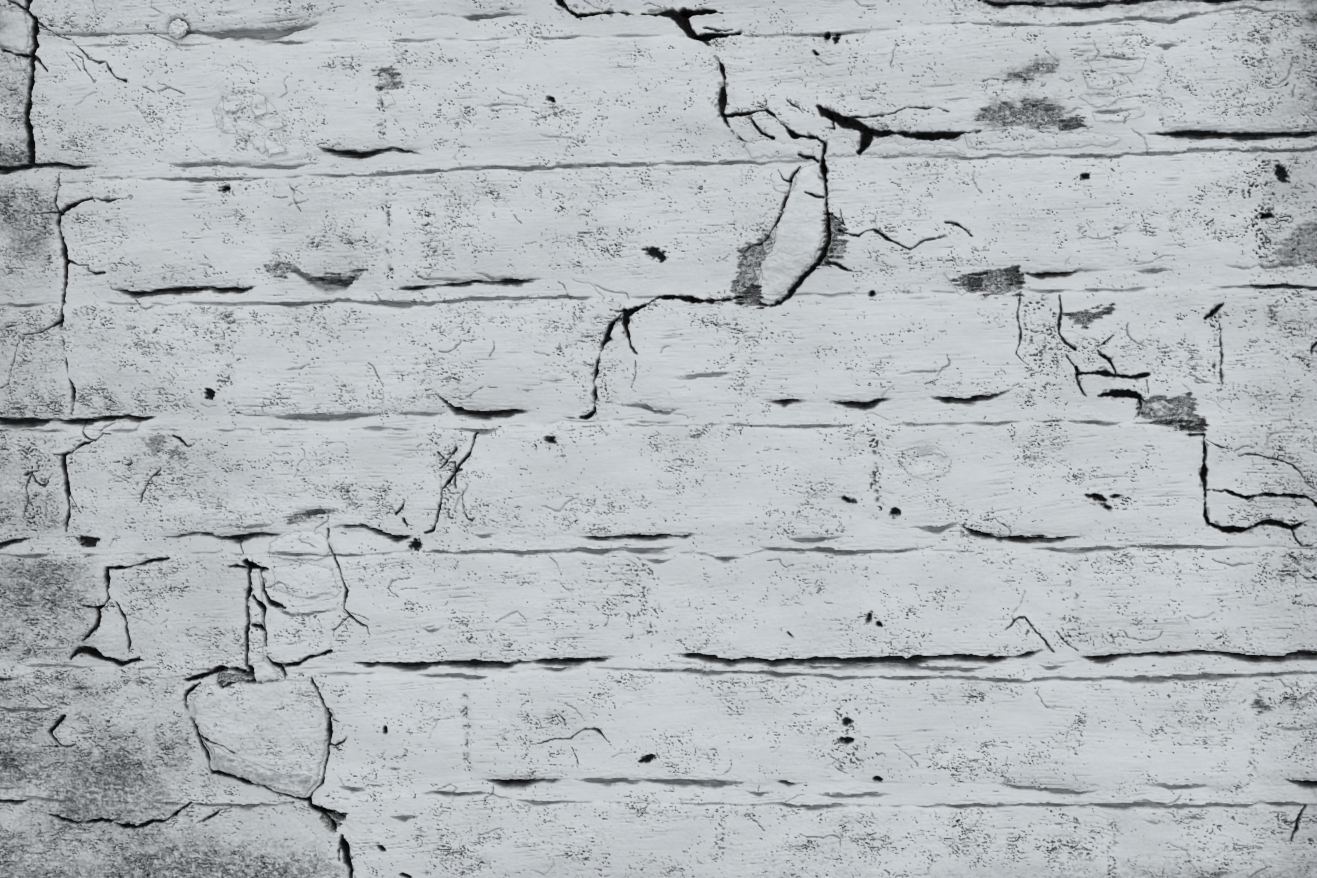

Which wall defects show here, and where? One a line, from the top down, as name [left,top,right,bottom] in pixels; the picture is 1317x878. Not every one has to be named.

crack [3,0,47,165]
crack [41,198,116,332]
crack [556,0,979,419]
crack [1058,302,1150,415]
crack [1204,304,1223,378]
crack [26,436,91,531]
crack [396,432,479,533]
crack [1200,441,1317,545]
crack [71,558,169,666]
crack [185,545,353,878]